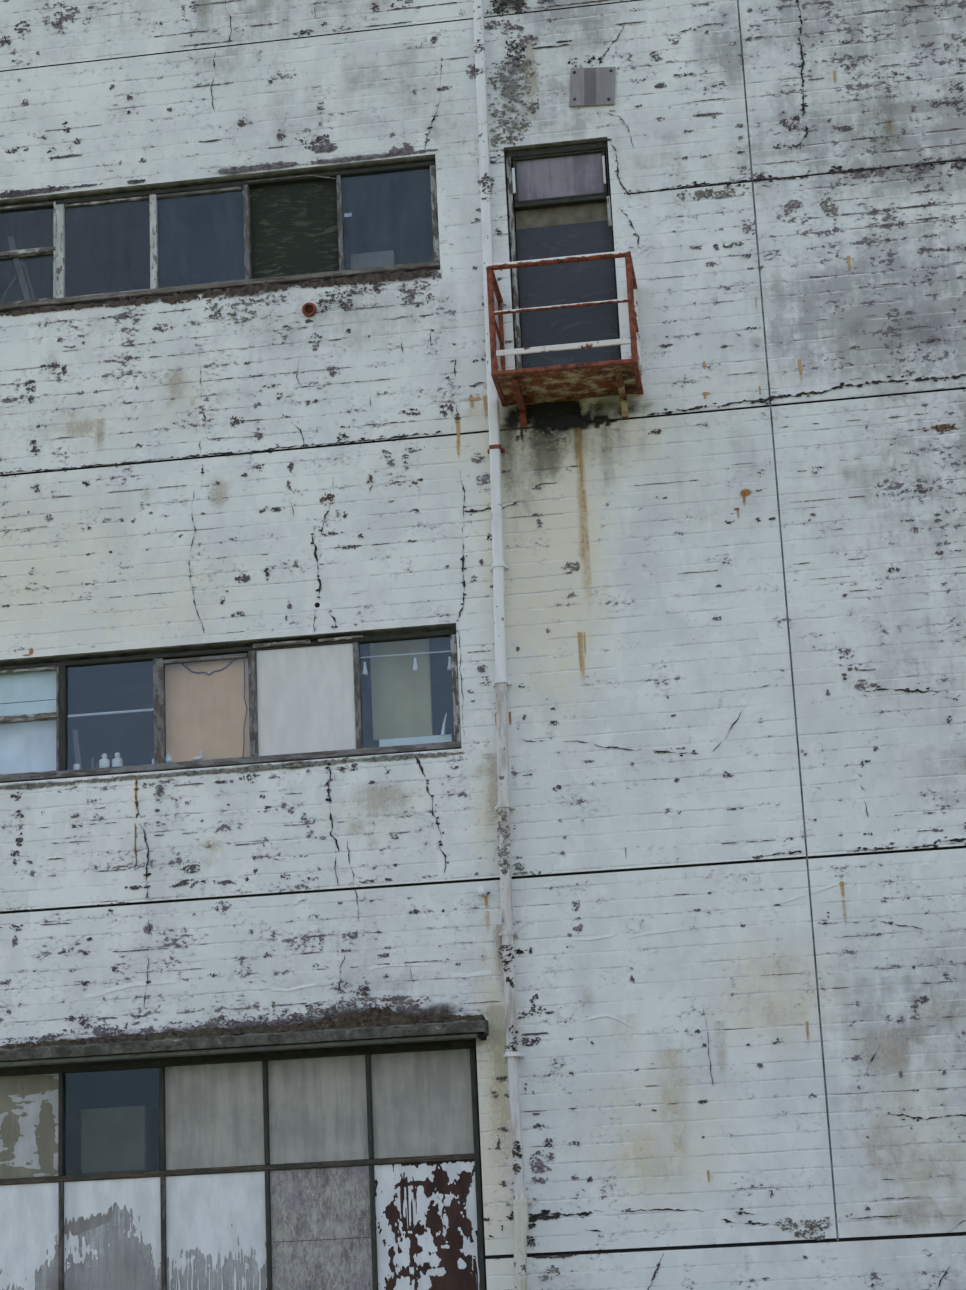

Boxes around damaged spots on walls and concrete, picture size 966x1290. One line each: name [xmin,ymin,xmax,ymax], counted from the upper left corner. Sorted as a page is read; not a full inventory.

crack [606,0,966,244]
peeling [0,267,442,440]
damp [503,400,635,473]
crack [0,353,458,633]
rust [578,632,586,671]
crack [325,763,359,917]
crack [415,756,449,872]
peeling [566,901,583,948]
peeling [498,944,532,989]
damp [395,1005,453,1015]
peeling [505,994,553,1052]
peeling [488,1110,555,1187]